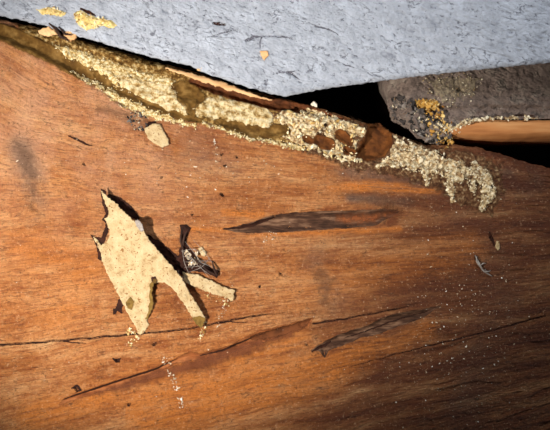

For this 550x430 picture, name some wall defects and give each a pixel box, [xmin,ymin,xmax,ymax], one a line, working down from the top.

peeling [91,189,235,335]
crack [0,313,280,346]
crack [200,333,262,356]